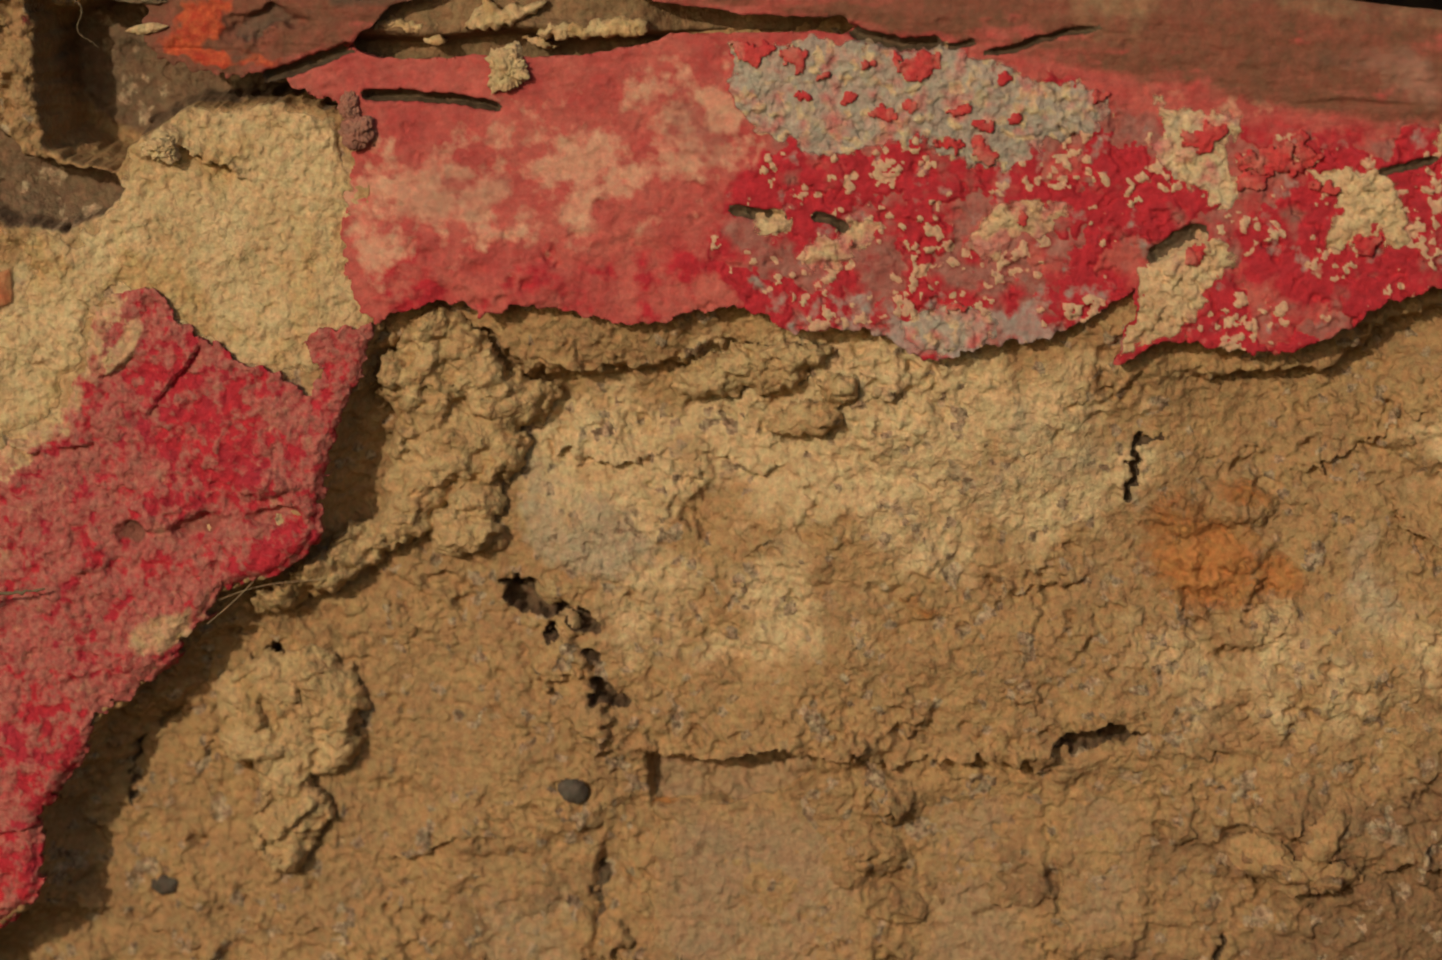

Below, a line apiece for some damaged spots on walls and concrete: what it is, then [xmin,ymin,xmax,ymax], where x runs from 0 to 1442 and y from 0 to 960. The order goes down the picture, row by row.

crack [263,0,1102,111]
peeling [727,33,1112,172]
spalling [0,101,373,437]
peeling [753,208,792,235]
peeling [803,219,887,272]
peeling [900,303,998,355]
peeling [964,199,1074,262]
peeling [1123,229,1236,353]
peeling [1149,96,1410,257]
crack [1123,431,1164,503]